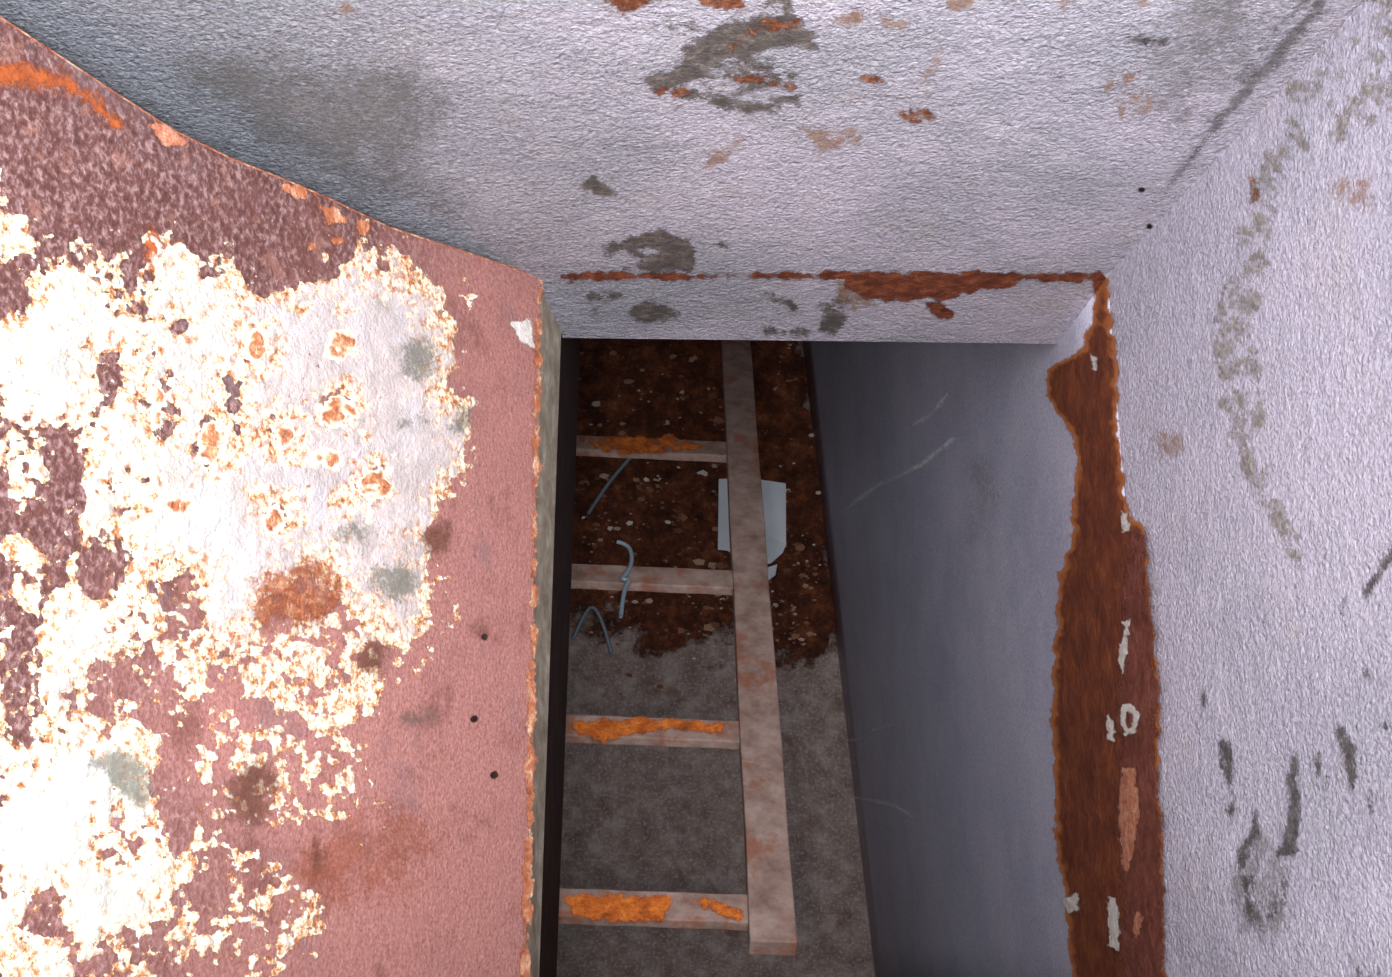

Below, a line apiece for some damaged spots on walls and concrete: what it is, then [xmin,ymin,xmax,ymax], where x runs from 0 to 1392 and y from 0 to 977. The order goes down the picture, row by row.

corrosion [604,0,661,15]
corrosion [699,0,745,13]
corrosion [728,17,799,52]
corrosion [0,61,123,129]
corrosion [654,87,690,98]
corrosion [734,74,797,92]
peeling [149,123,187,147]
peeling [0,168,478,977]
corrosion [1046,278,1167,977]